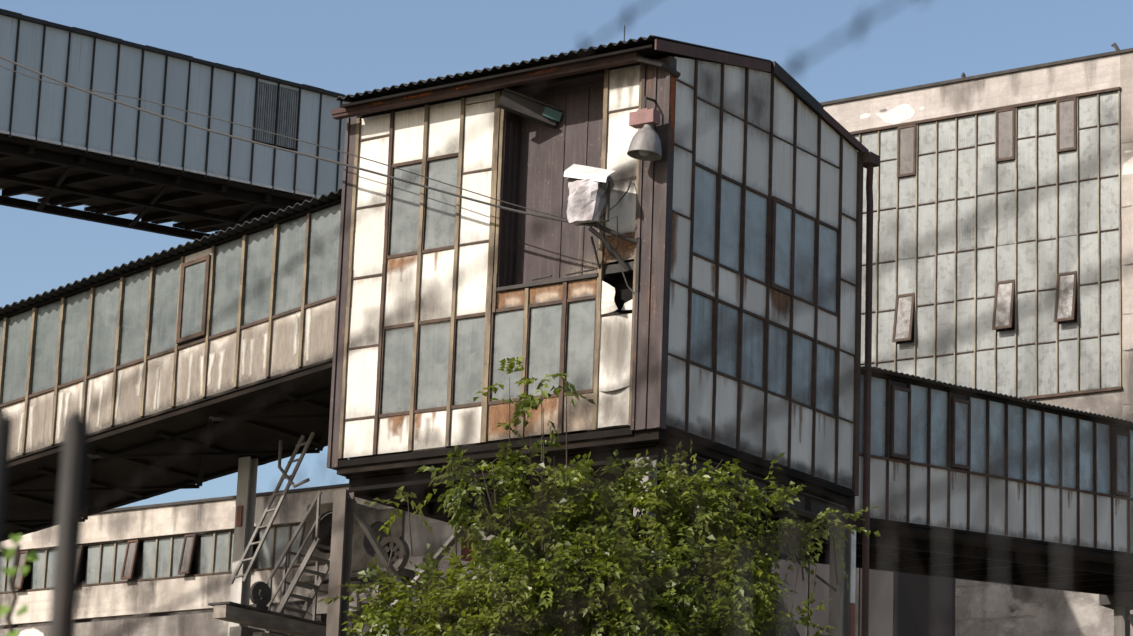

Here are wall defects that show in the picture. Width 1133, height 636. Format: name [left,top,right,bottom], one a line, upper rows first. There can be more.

peeling [860,104,924,125]
peeling [1122,156,1133,175]
leakage [10,306,336,453]
rust [388,411,434,437]
rust [489,398,557,433]